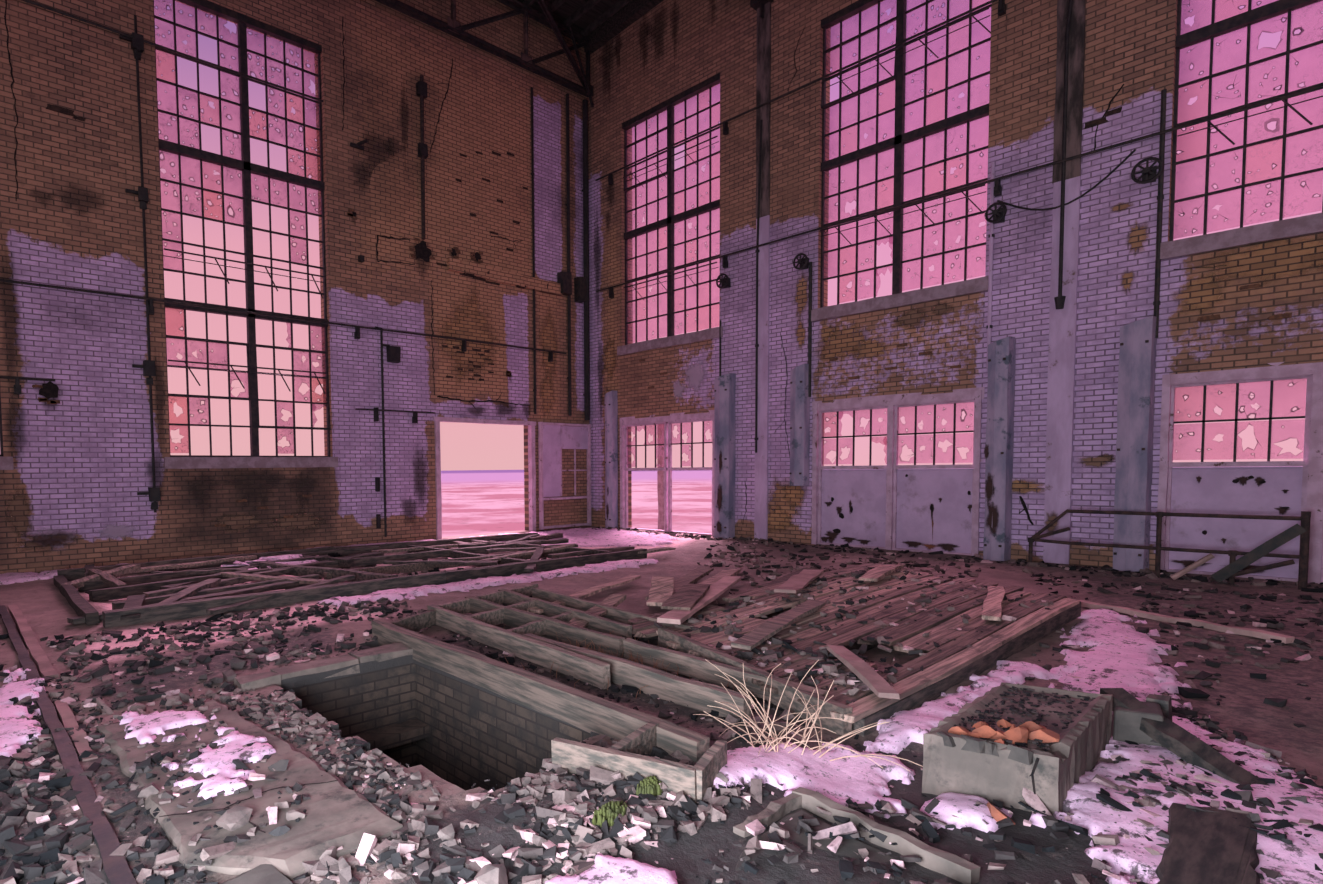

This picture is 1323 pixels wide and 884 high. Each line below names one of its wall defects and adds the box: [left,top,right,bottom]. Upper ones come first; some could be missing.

peeling [795,275,933,380]
peeling [894,302,952,327]
spalling [32,381,60,407]
peeling [7,491,76,552]
peeling [768,481,805,531]